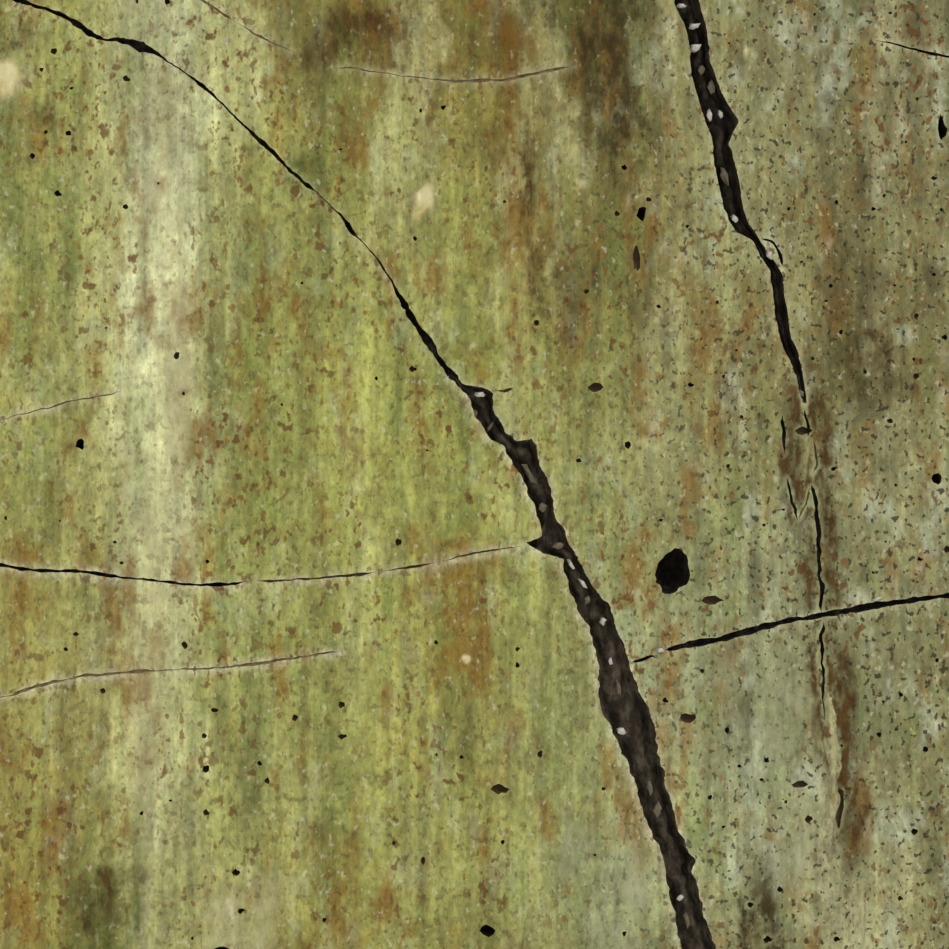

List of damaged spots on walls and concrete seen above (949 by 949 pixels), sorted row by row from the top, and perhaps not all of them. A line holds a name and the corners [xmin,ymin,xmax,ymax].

crack [674,0,818,472]
crack [876,40,949,58]
crack [0,0,716,949]
crack [656,478,949,719]